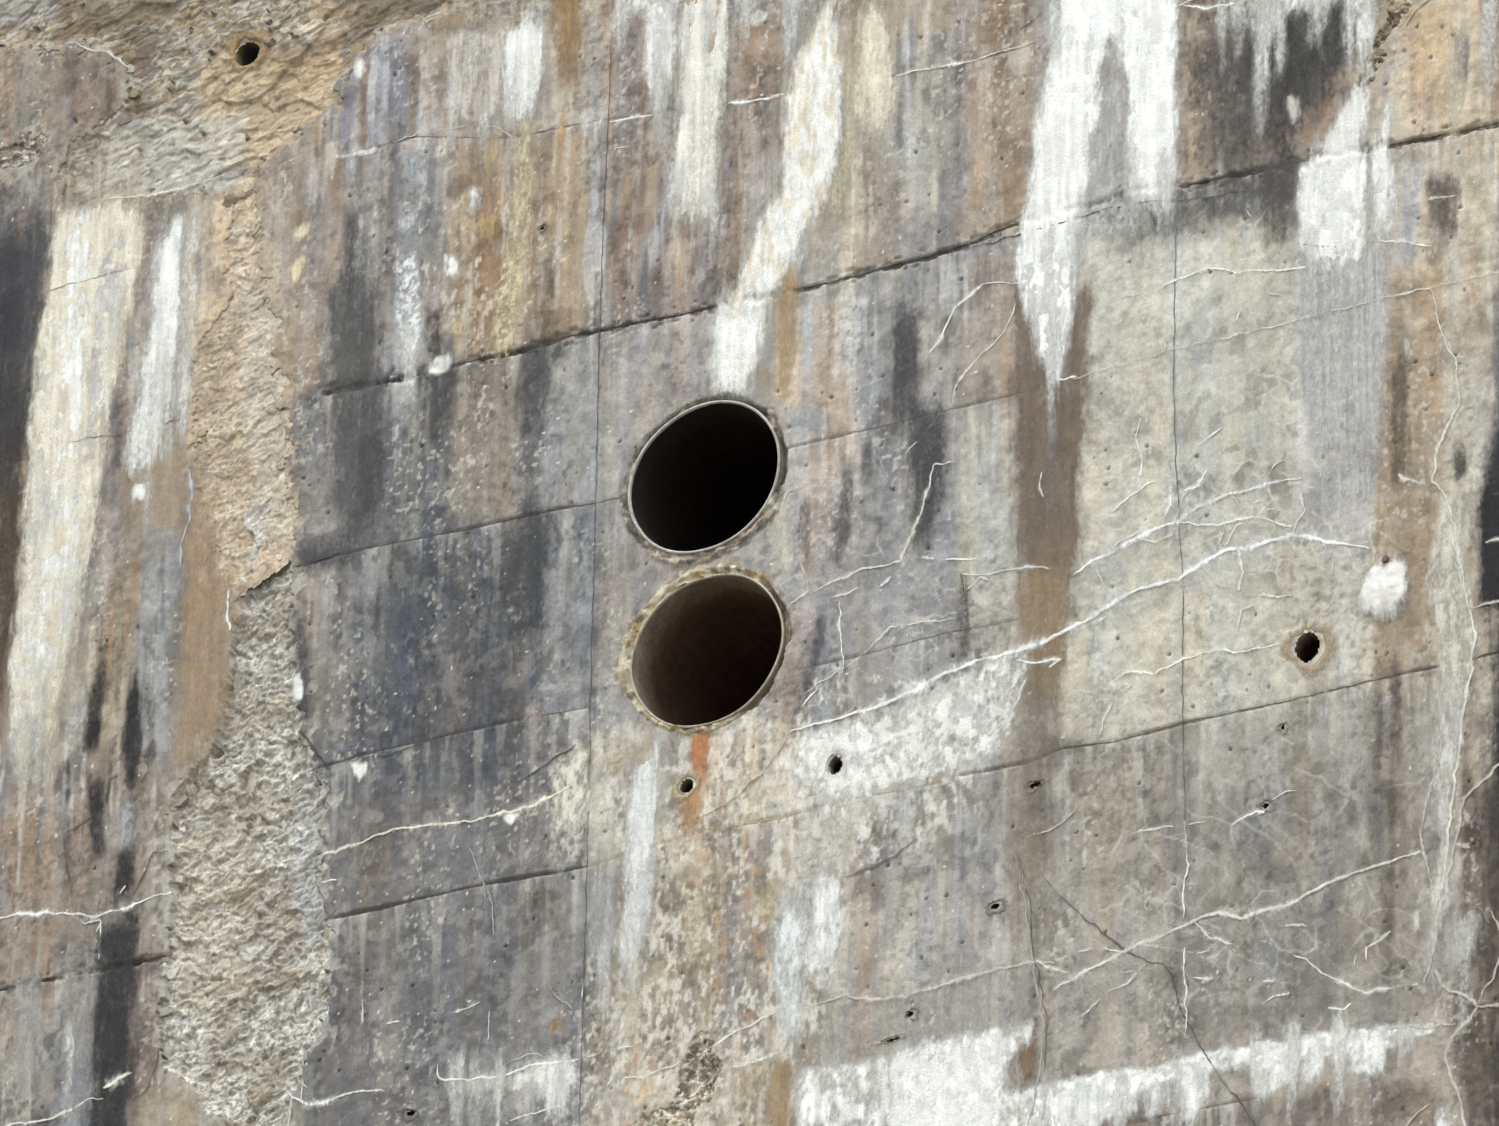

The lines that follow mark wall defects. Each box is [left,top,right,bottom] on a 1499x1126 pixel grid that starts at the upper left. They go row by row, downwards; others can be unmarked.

efflorescence [611,0,896,401]
efflorescence [1015,0,1179,405]
spalling [1358,0,1412,88]
crack [7,1048,159,1126]
water stain [2,156,202,788]
spalling [0,0,555,1126]
crack [287,1080,384,1126]
crack [322,744,576,936]
spalling [633,1031,723,1126]
corrosion [683,731,708,825]
crack [437,190,1499,1126]
water stain [758,653,1435,1126]